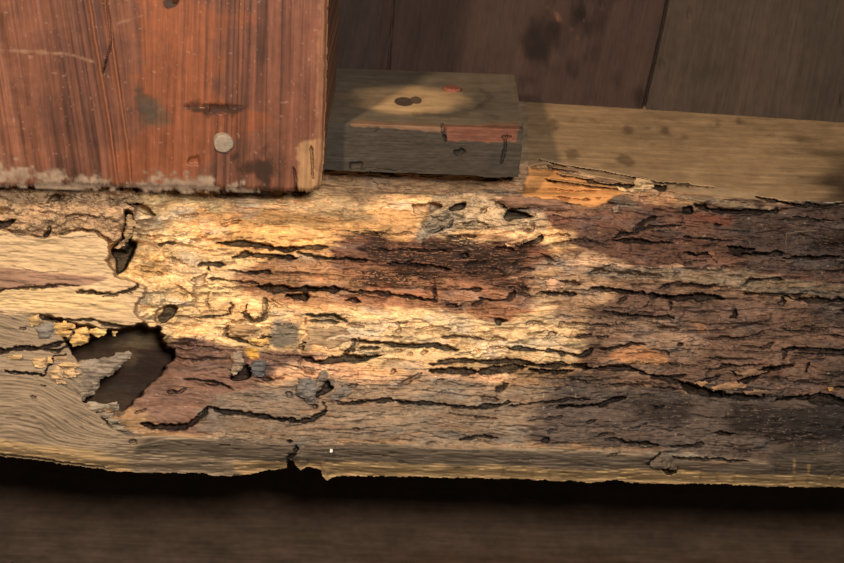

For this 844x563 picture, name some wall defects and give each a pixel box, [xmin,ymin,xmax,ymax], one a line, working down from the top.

crack [103,0,112,74]
damp [0,159,115,190]
damp [126,173,249,193]
damp [246,161,272,186]
crack [293,147,315,186]
crack [547,174,842,221]
crack [614,217,844,312]
crack [0,284,139,297]
crack [42,317,133,330]
spalling [0,211,177,432]
crack [0,341,70,377]
crack [141,240,844,466]